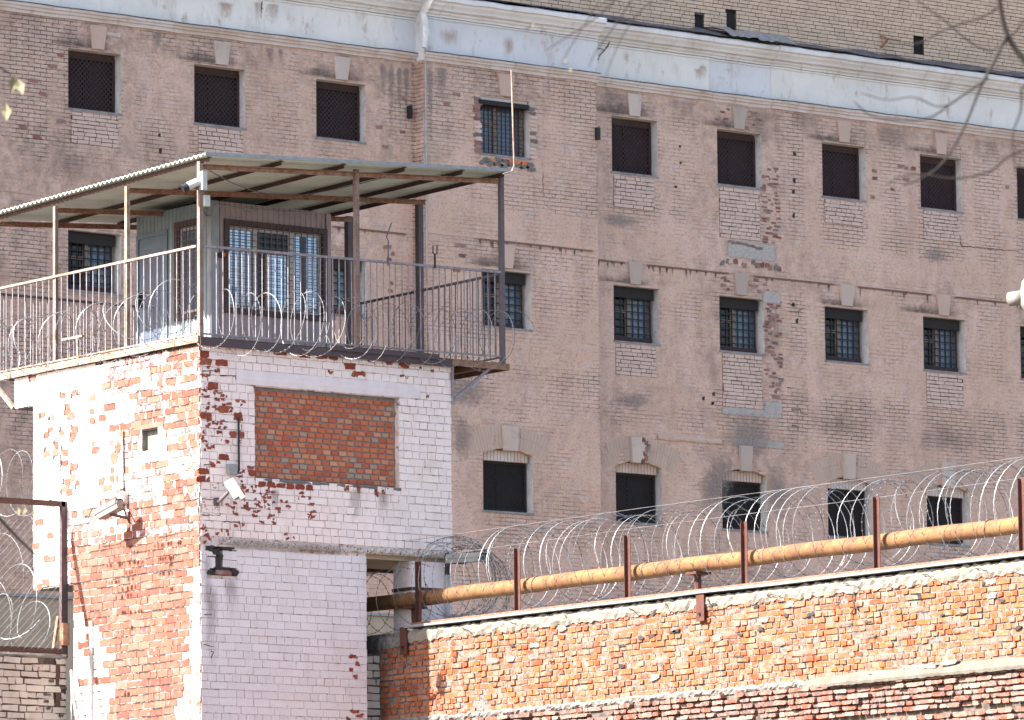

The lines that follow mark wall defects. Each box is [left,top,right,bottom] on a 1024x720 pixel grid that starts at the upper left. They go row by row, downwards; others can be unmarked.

spalling [472,96,539,172]
flaking render [702,166,798,415]
peeling [32,344,317,720]
spalling [641,437,651,464]